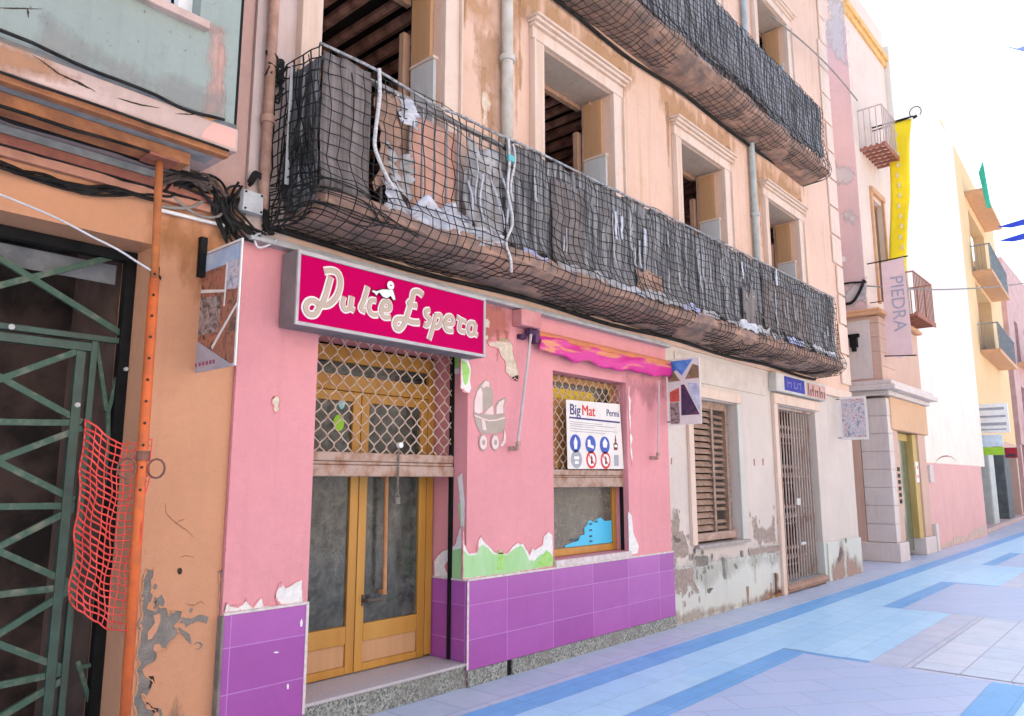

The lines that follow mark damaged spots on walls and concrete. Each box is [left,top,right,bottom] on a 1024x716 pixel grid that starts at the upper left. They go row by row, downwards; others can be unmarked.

crack [33,55,94,91]
peeling [486,319,519,381]
crack [165,504,194,558]
peeling [433,474,554,580]
peeling [628,512,639,554]
peeling [671,506,780,607]
peeling [132,568,304,716]